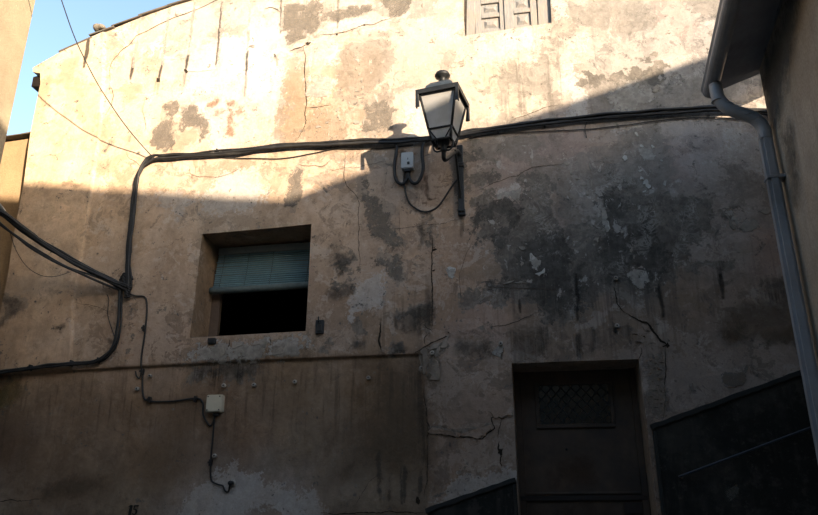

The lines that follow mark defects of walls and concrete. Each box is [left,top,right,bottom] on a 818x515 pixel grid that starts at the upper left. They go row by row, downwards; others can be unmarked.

crack [105,0,216,115]
crack [291,16,394,138]
crack [303,161,382,256]
peeling [516,243,545,276]
peeling [627,248,650,289]
spalling [183,333,314,365]
crack [614,288,670,421]
crack [321,384,506,515]